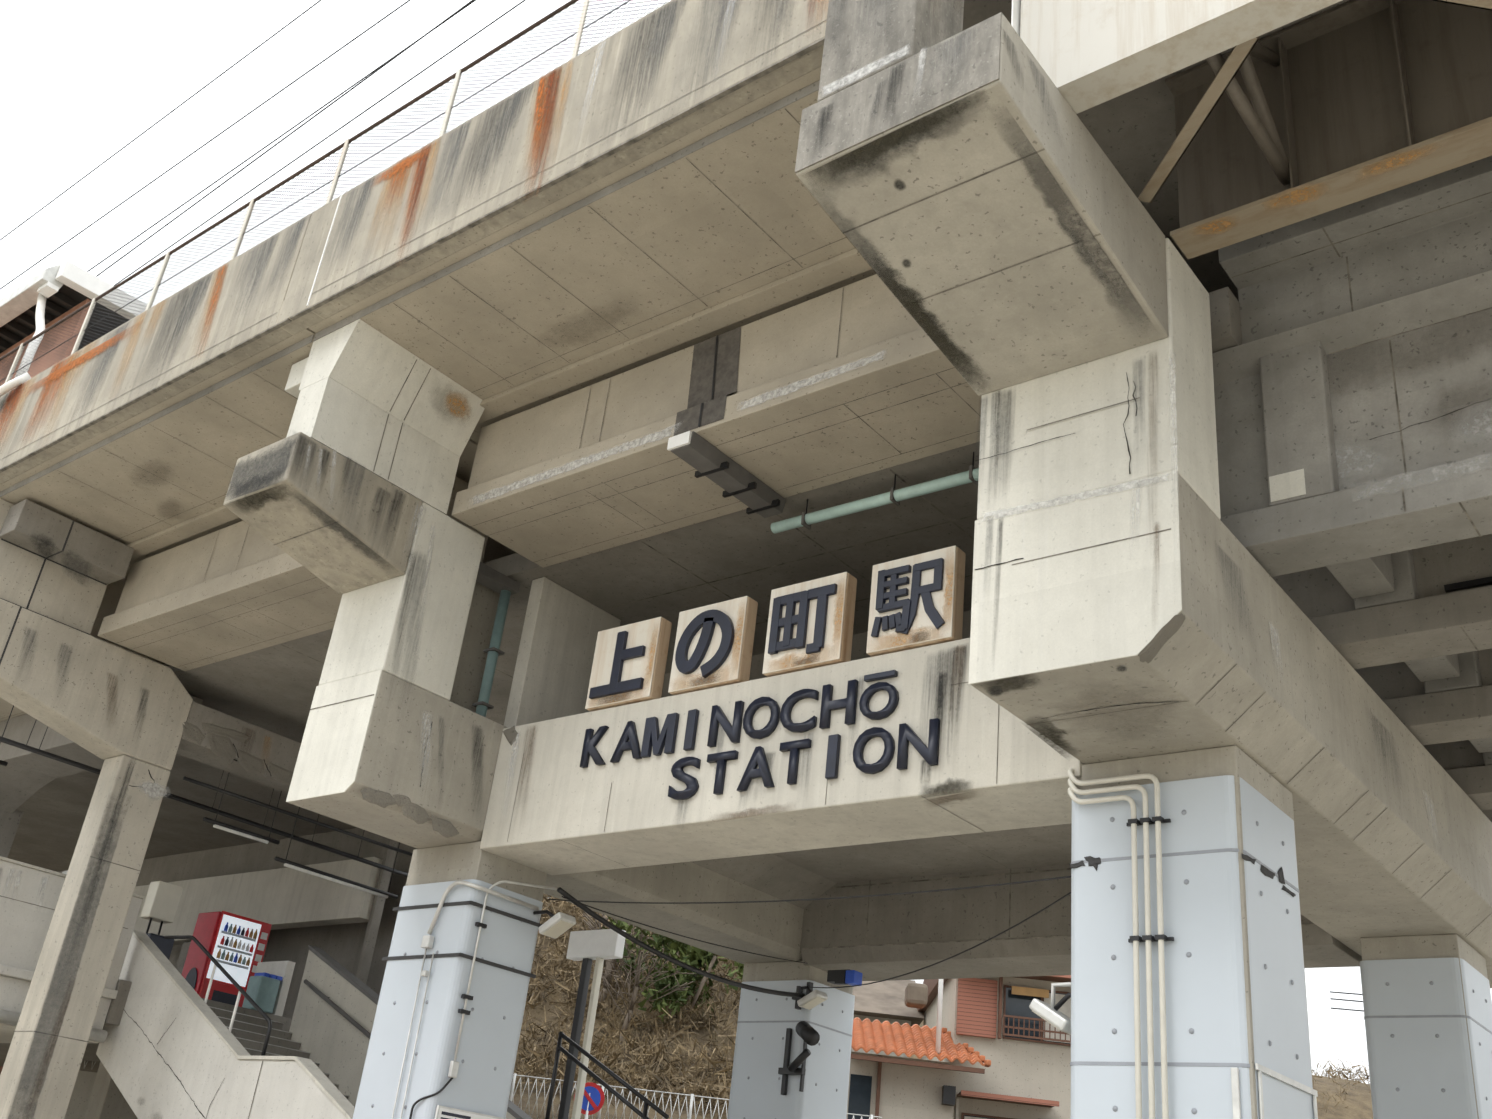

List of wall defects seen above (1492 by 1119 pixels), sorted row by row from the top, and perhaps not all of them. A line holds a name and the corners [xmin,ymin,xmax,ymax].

corrosion [535,70,564,158]
leakage [830,102,957,170]
corrosion [380,142,436,227]
leakage [1029,163,1133,303]
leakage [841,230,971,374]
corrosion [0,307,158,430]
crack [1123,372,1137,474]
leakage [937,648,966,712]
spalling [360,788,459,838]
leakage [925,782,962,802]